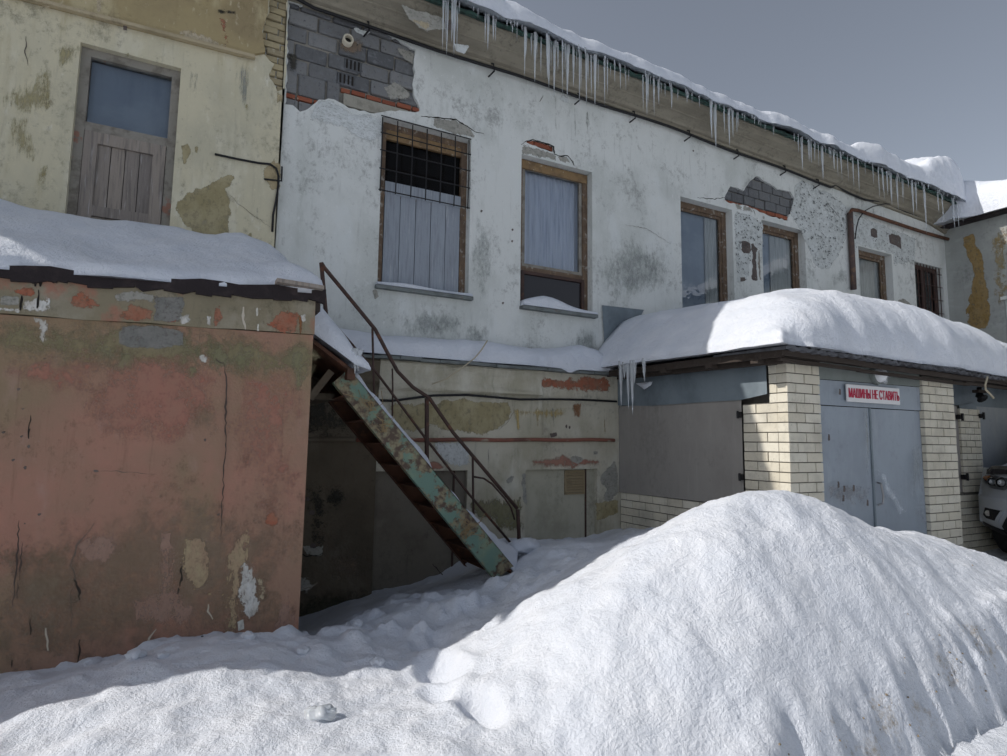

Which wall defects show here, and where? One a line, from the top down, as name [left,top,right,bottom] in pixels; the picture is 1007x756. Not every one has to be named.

spalling [263,0,484,141]
spalling [521,139,573,163]
peeling [176,175,234,234]
spalling [698,177,916,283]
peeling [0,287,50,342]
peeling [115,291,190,324]
peeling [963,232,1007,329]
flaking render [542,376,610,392]
crack [216,359,227,537]
peeling [533,451,618,520]
crack [12,522,32,635]
peeling [159,530,265,633]